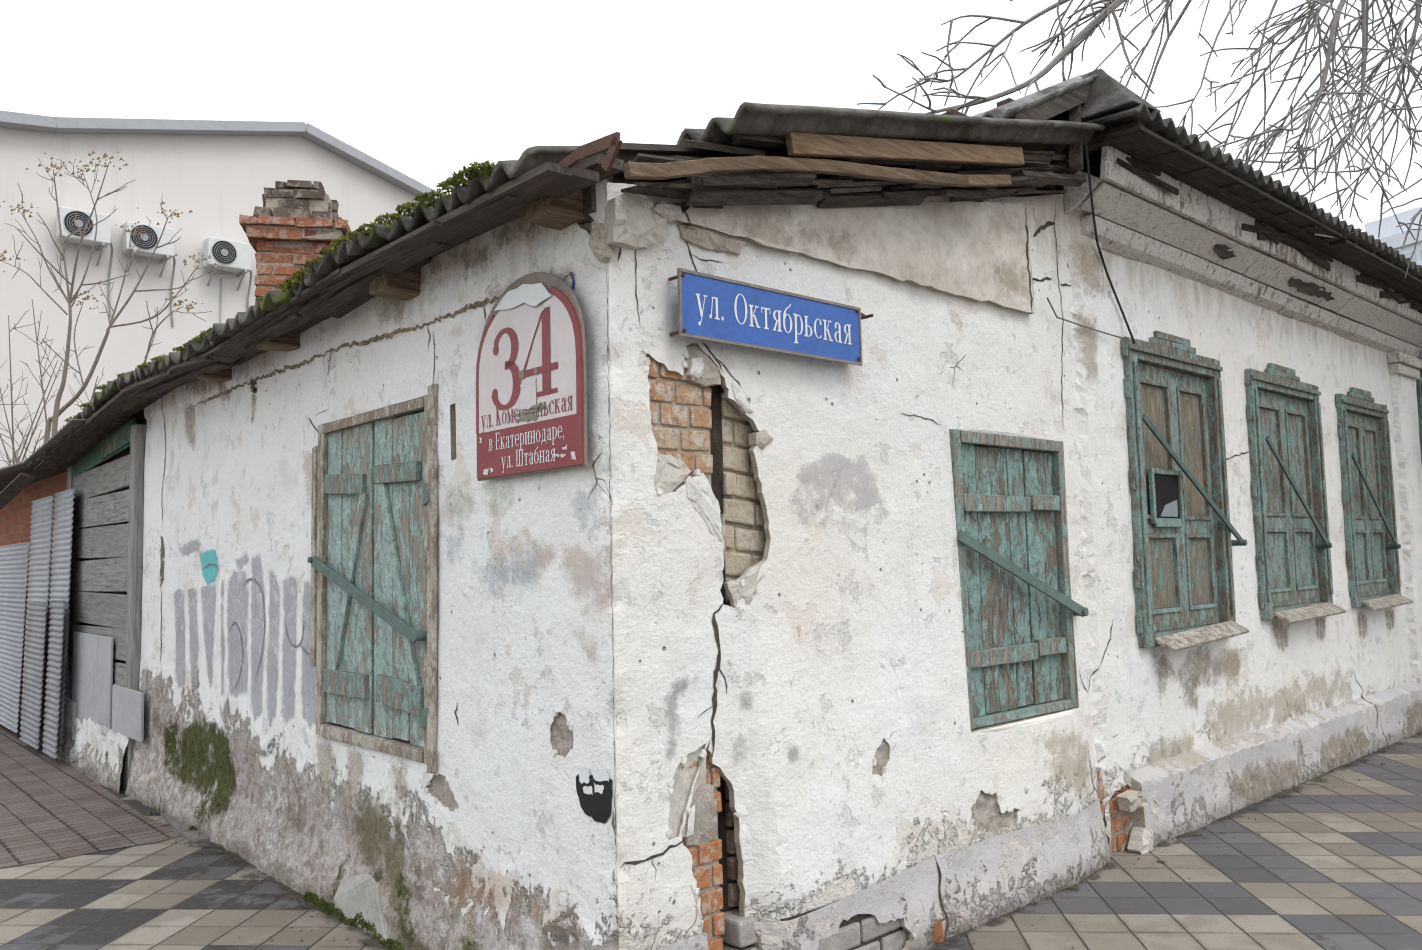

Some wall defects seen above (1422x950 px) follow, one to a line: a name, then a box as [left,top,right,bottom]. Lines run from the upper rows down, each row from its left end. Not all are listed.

crack [161,296,500,525]
flaking render [642,341,773,607]
crack [564,247,687,920]
crack [699,604,727,757]
leakage [1158,651,1240,706]
leakage [163,723,177,772]
spalling [551,709,573,757]
flaking render [666,745,759,950]
spalling [970,789,1023,832]
flaking render [1097,769,1166,854]
flaking render [817,914,916,950]
crack [933,855,949,942]